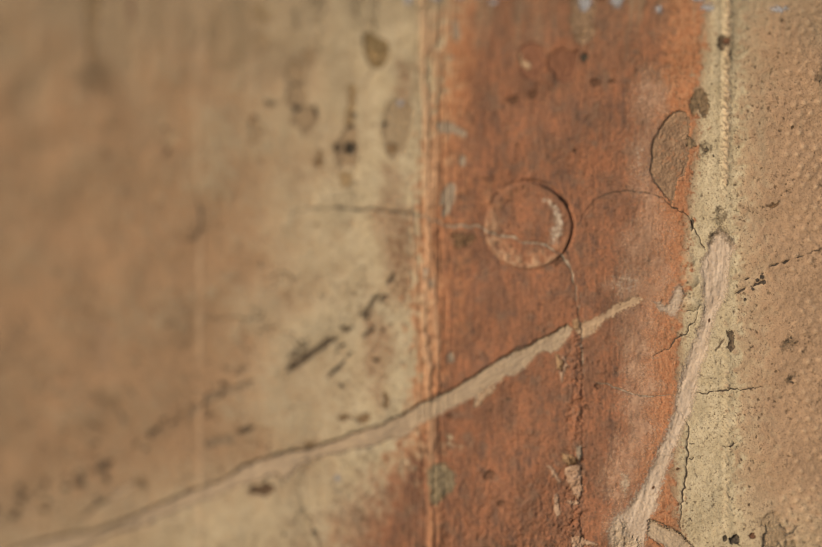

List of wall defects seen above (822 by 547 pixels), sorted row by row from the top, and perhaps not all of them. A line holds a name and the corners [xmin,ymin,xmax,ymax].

peeling [264,48,319,135]
spalling [333,84,360,188]
spalling [363,32,390,69]
peeling [650,88,710,203]
crack [294,159,704,397]
spalling [20,296,643,547]
damp [603,156,735,547]
crack [680,421,694,528]
crack [695,386,761,394]